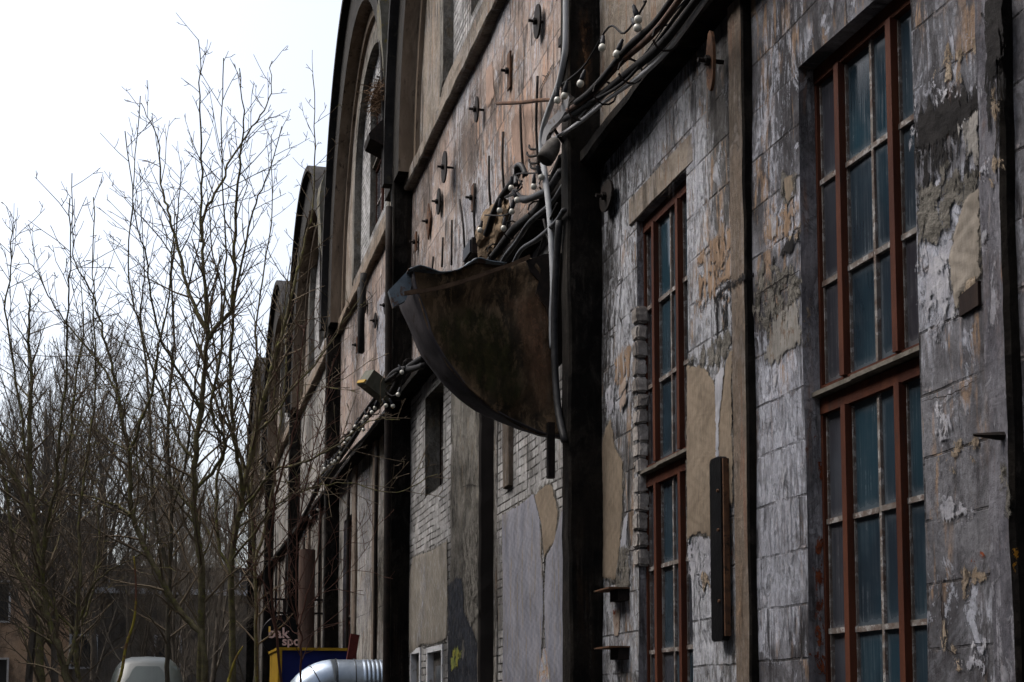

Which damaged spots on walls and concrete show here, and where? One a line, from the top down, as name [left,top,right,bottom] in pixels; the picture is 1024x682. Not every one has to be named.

spalling [930,37,976,105]
peeling [765,169,801,245]
spalling [915,111,1005,341]
spalling [752,261,817,348]
peeling [687,209,734,514]
spalling [602,345,632,587]
peeling [934,390,980,474]
spalling [999,443,1012,519]
peeling [501,481,563,682]
peeling [687,532,711,631]
spalling [960,565,990,600]
spalling [940,621,962,672]